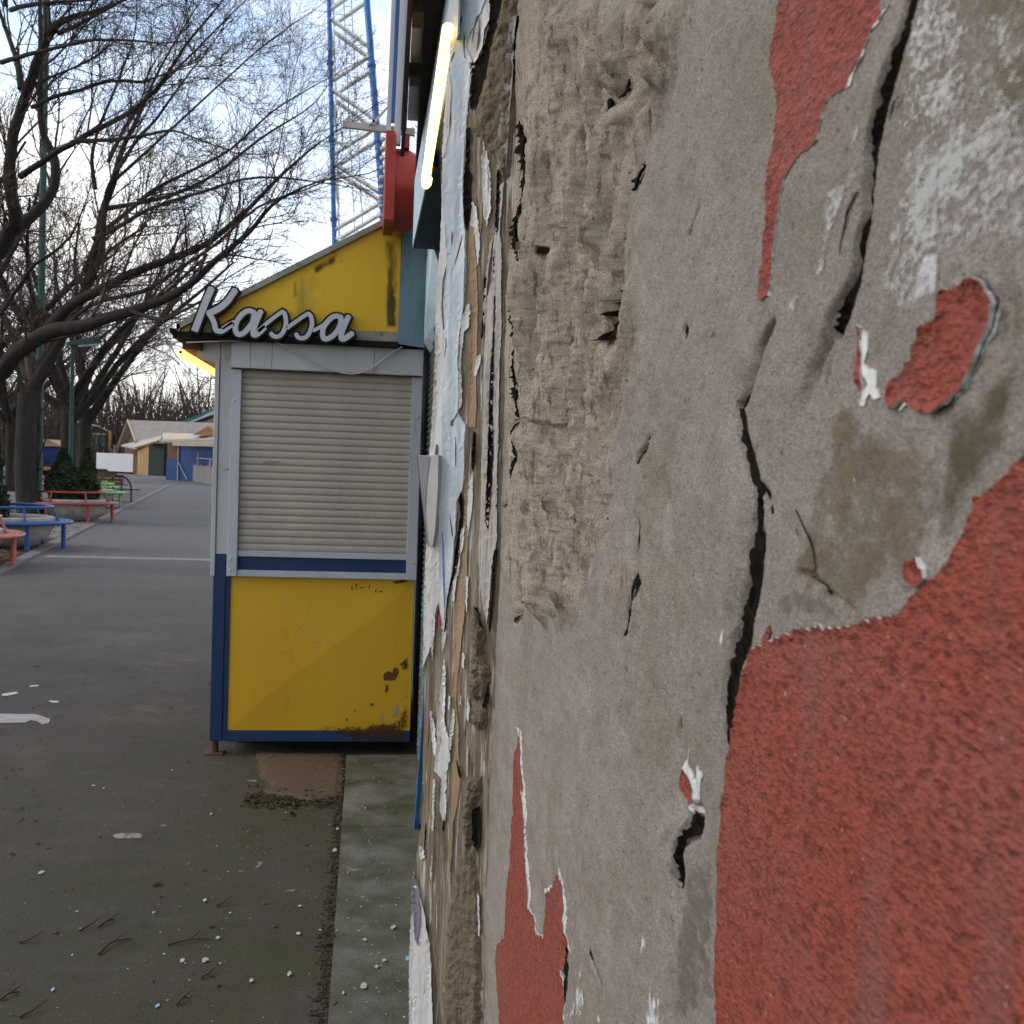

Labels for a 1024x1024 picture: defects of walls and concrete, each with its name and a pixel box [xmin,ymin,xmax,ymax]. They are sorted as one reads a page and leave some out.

peeling [757,0,890,300]
crack [834,0,918,337]
peeling [853,278,1002,414]
corrosion [324,707,407,740]
corrosion [383,667,399,693]
spalling [408,0,695,1024]
crack [624,521,641,636]
crack [673,810,705,889]
crack [726,386,834,744]
peeling [713,453,1024,1024]